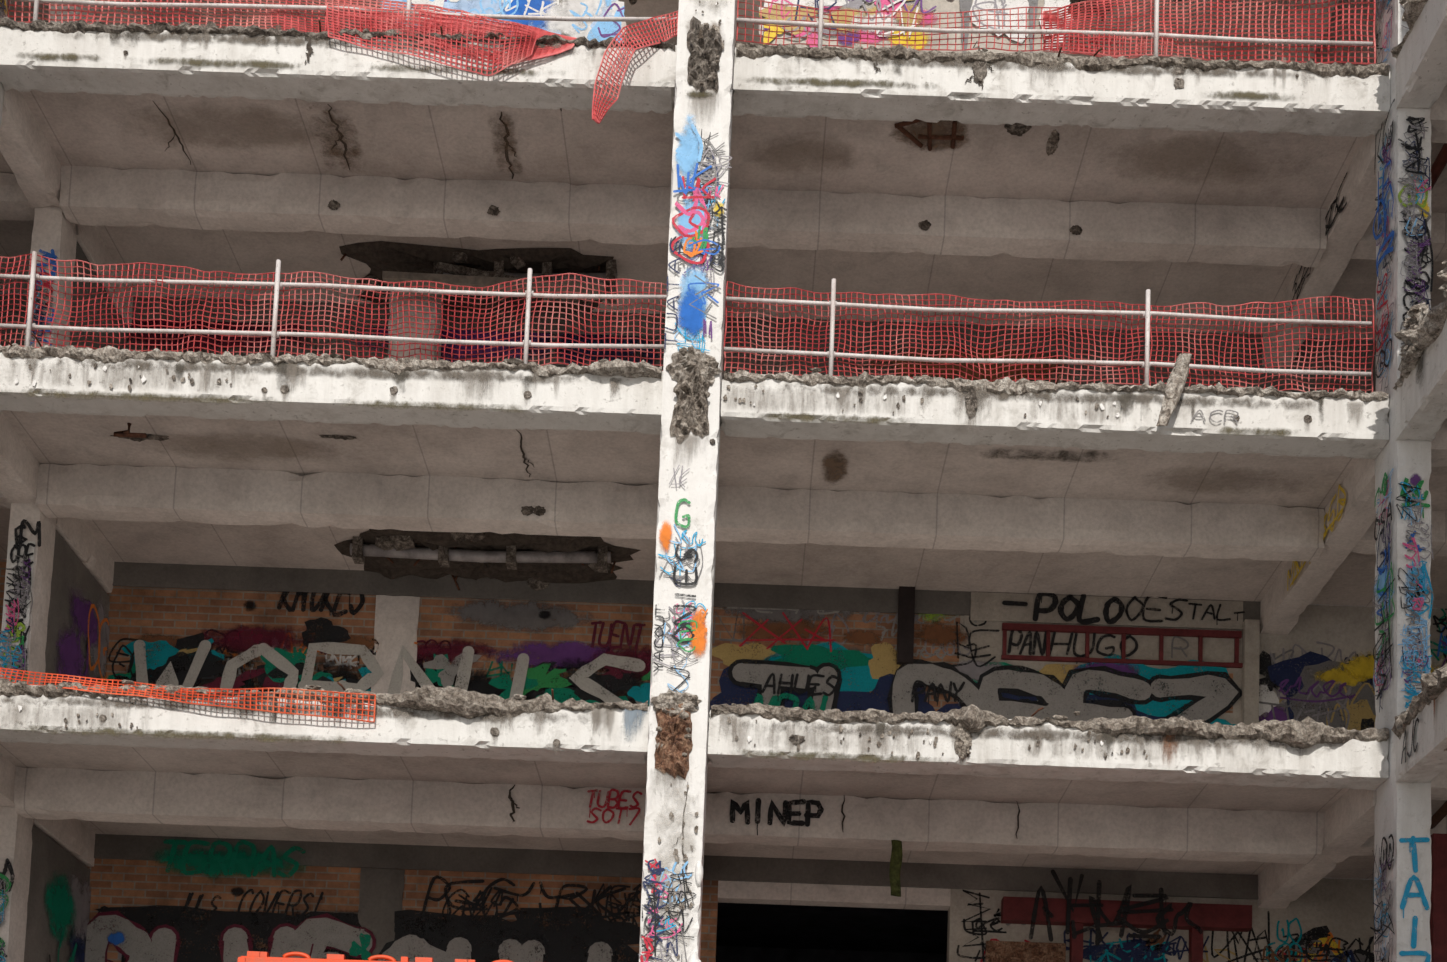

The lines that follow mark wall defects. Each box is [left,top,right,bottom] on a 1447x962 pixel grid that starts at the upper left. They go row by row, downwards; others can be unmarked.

crack [305,36,314,64]
spalling [0,0,1428,93]
crack [328,104,350,170]
crack [499,112,516,179]
spalling [1004,123,1032,137]
spalling [339,241,614,307]
spalling [443,295,602,319]
spalling [1182,249,1447,423]
spalling [0,332,1166,445]
spalling [521,505,546,516]
spalling [334,529,640,591]
spalling [0,658,1447,959]